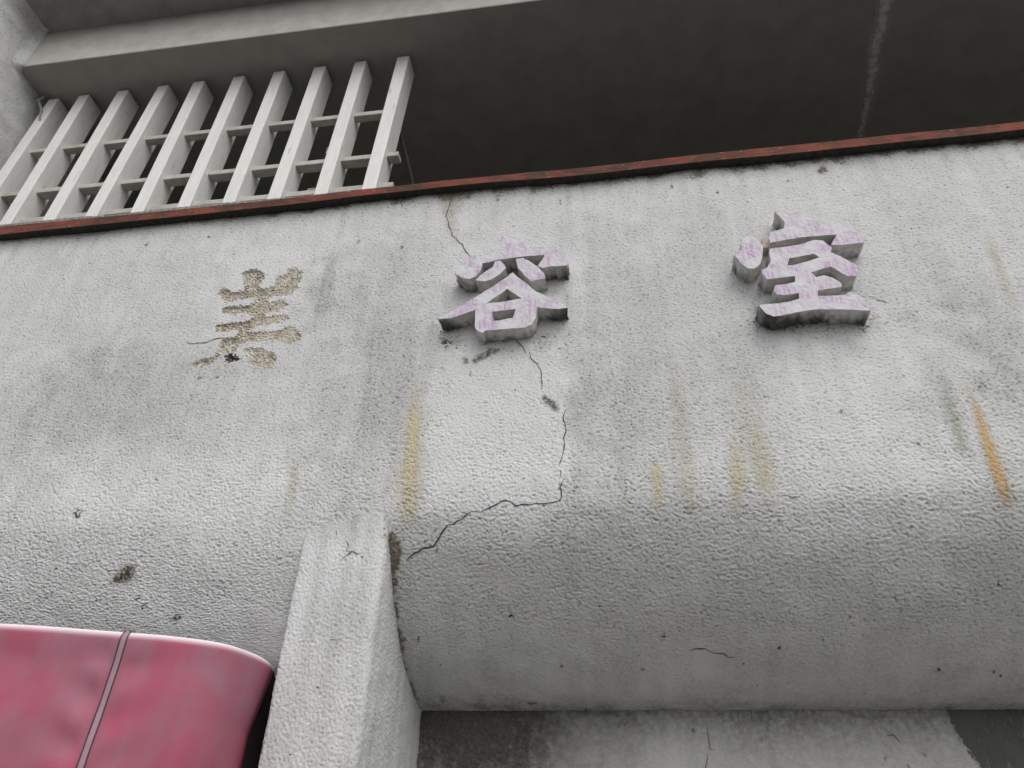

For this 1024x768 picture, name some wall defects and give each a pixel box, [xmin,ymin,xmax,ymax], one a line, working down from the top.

crack [406,340,569,562]
rust [976,410,1009,498]